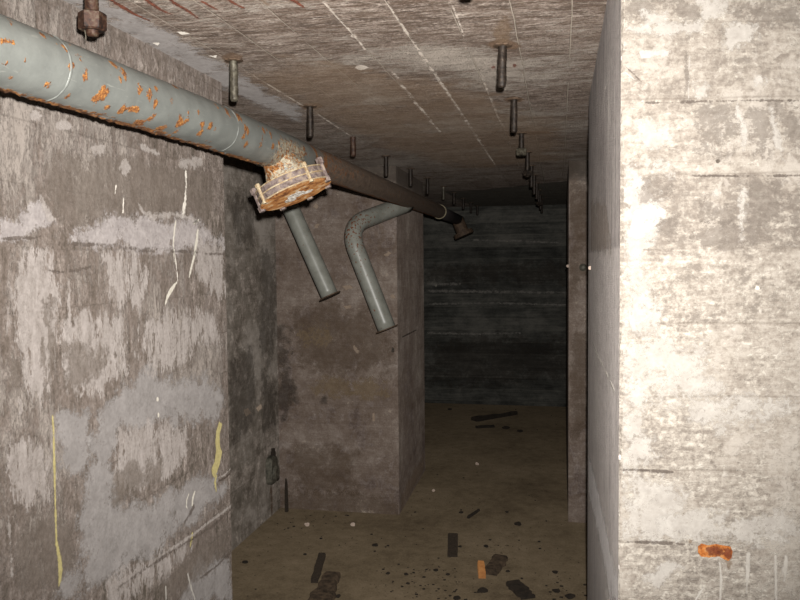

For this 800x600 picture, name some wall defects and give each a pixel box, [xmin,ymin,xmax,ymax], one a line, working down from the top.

rust [698,544,732,561]